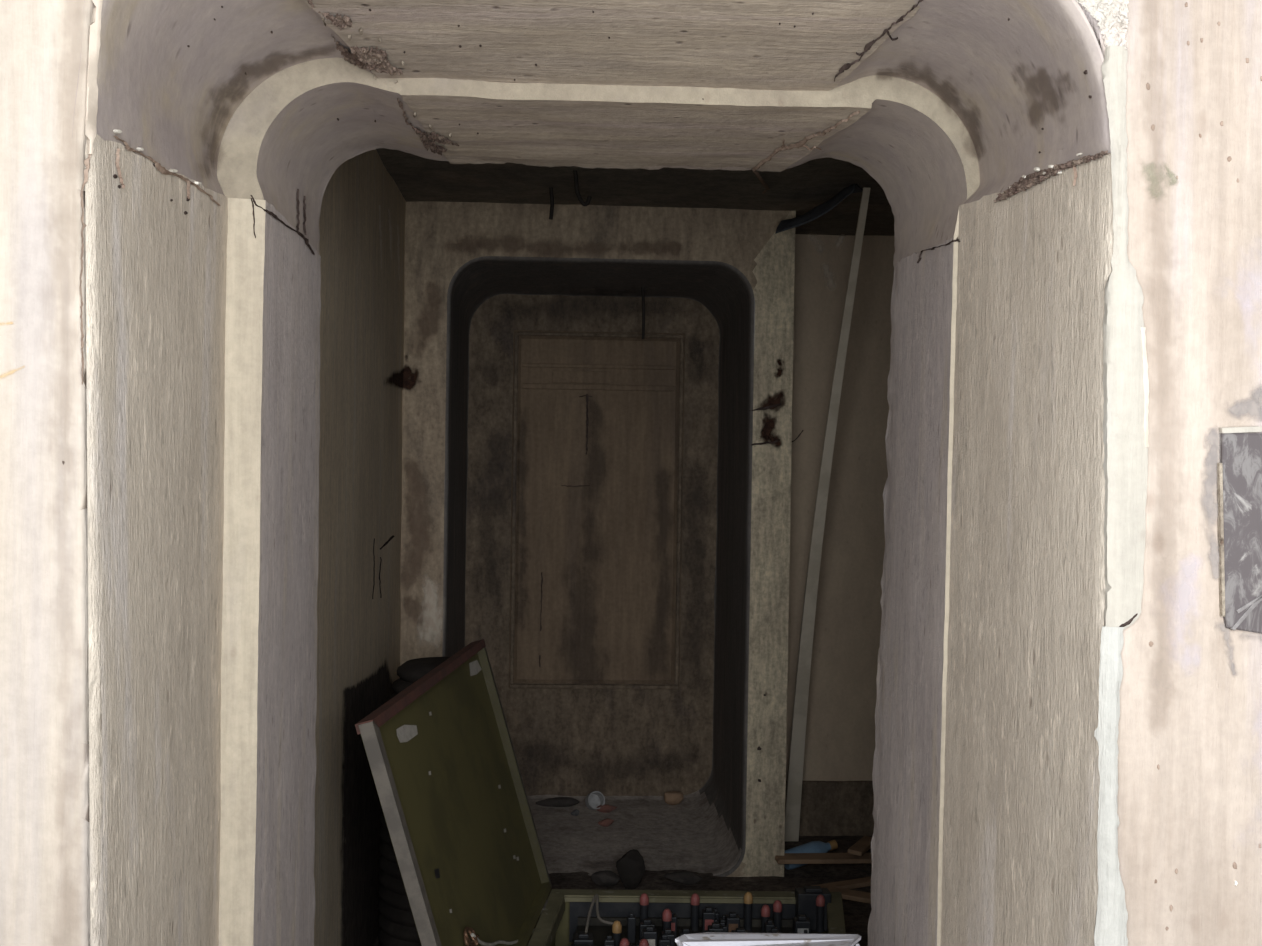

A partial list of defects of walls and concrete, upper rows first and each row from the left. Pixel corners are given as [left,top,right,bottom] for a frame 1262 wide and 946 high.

crack [834,0,923,82]
leakage [1029,71,1057,122]
crack [80,129,221,385]
crack [251,189,315,255]
leakage [403,465,440,643]